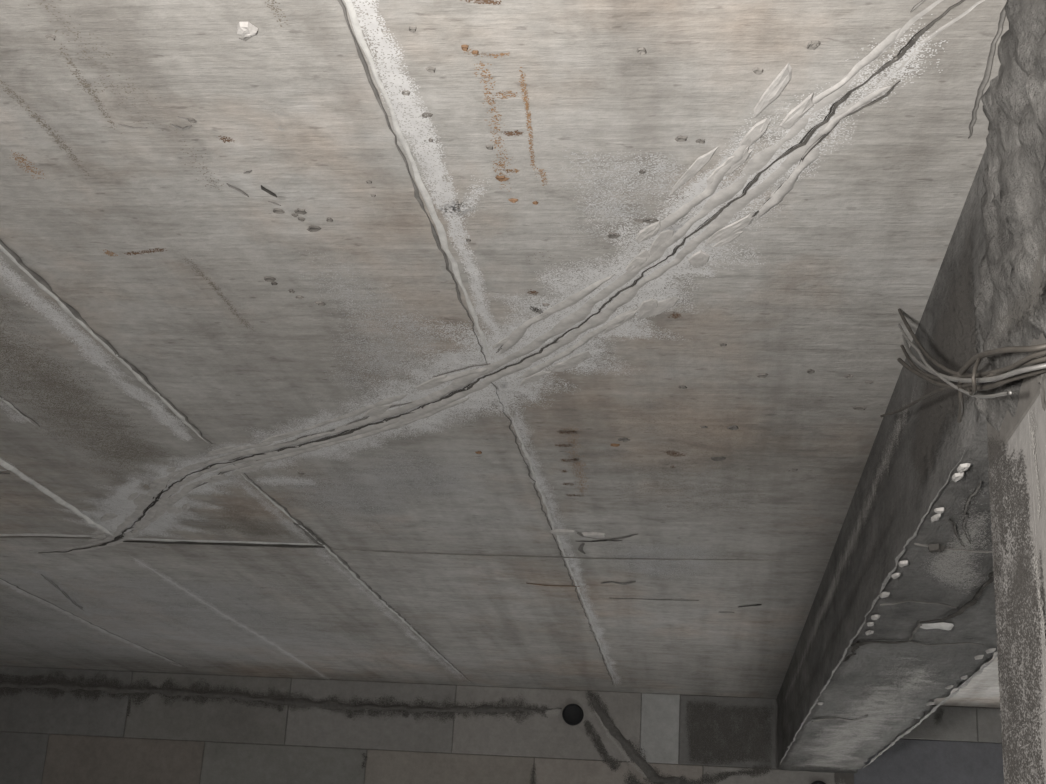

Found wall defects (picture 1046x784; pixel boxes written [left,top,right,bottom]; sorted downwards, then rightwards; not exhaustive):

corrosion [464,49,547,201]
leakage [0,0,948,685]
crack [31,0,1006,616]
spalling [780,448,970,765]
crack [843,480,994,662]